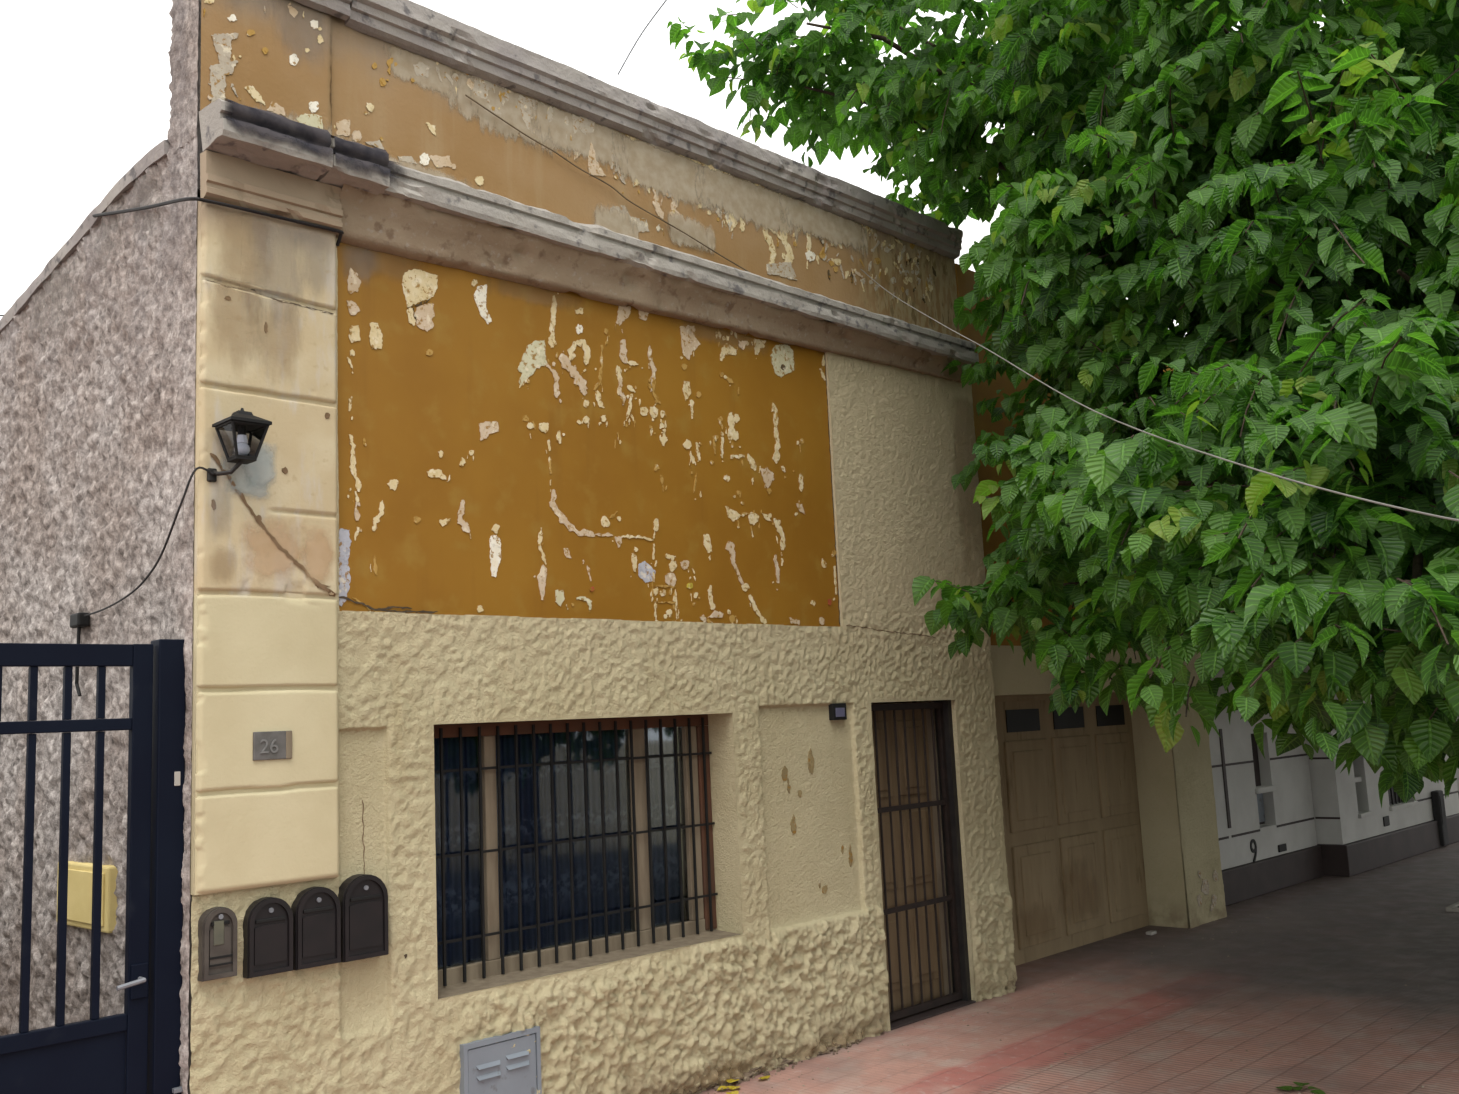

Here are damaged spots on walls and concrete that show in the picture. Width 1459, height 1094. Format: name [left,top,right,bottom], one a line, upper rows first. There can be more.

peeling [287,3,324,66]
peeling [207,14,456,169]
water stain [224,99,465,184]
peeling [372,58,680,236]
peeling [346,268,383,374]
peeling [402,269,438,356]
peeling [471,279,492,324]
peeling [698,203,936,306]
peeling [315,396,398,612]
peeling [427,421,499,482]
peeling [489,524,502,578]
peeling [518,293,805,624]